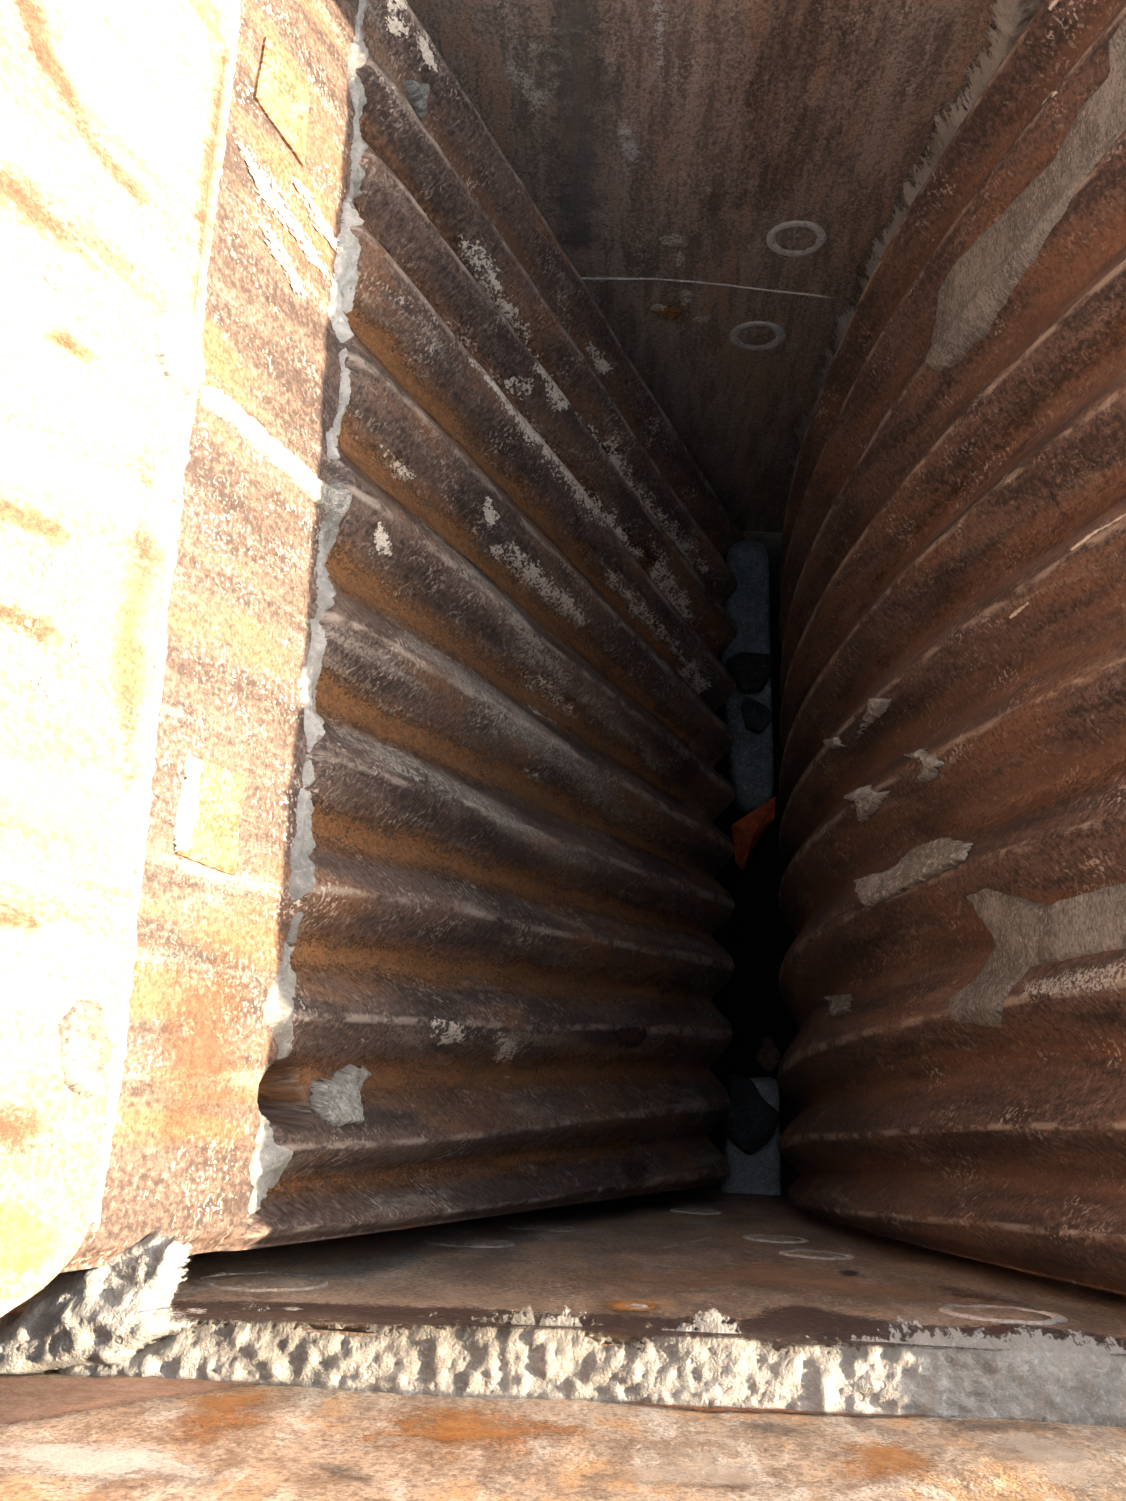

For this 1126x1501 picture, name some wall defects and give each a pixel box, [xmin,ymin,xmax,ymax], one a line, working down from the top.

rust [360,122,467,266]
rust [354,202,658,571]
rust [336,284,700,747]
rust [325,529,680,802]
rust [312,666,688,873]
rust [311,798,702,940]
rust [288,933,695,1011]
rust [257,1053,680,1103]
rust [0,1375,276,1441]
rust [364,1407,585,1460]
water stain [0,1227,1126,1488]
rust [619,1401,925,1417]